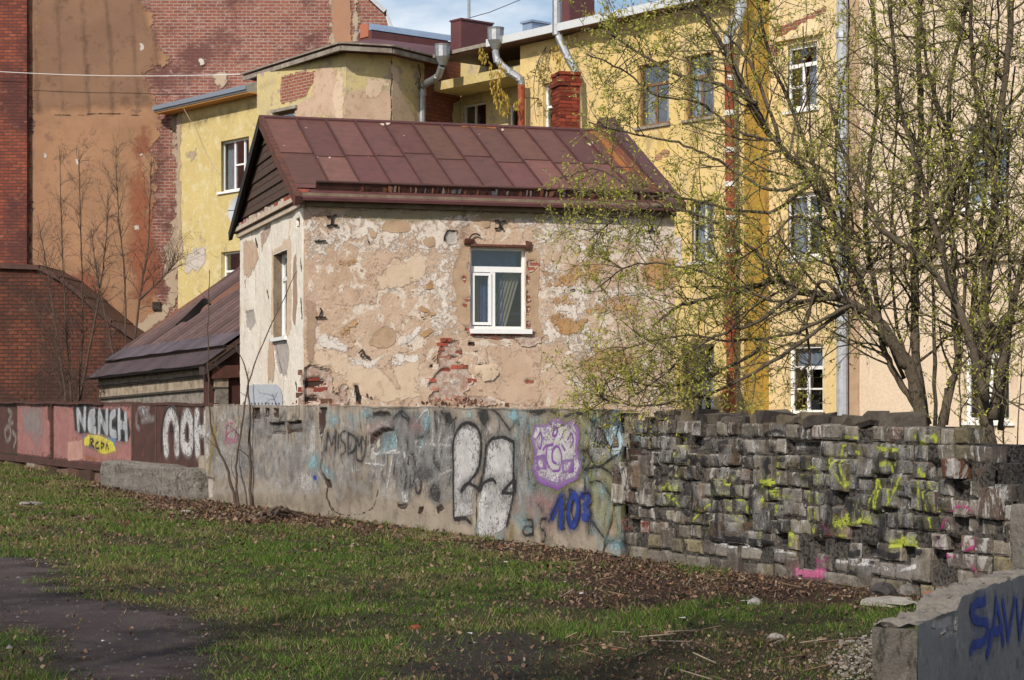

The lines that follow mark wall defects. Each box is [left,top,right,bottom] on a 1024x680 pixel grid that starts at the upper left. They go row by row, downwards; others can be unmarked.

flaking render [130,113,184,332]
peeling [243,210,678,511]